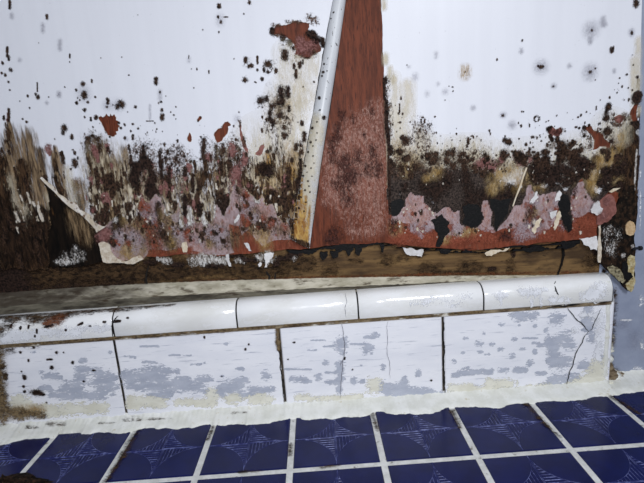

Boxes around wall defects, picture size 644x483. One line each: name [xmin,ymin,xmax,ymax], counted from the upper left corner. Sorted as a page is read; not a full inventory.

damp [0,41,640,293]
peeling [549,210,561,229]
peeling [590,201,603,215]
peeling [581,236,598,250]
peeling [38,355,276,401]
peeling [284,332,381,395]
crack [339,294,347,396]
peeling [379,376,445,397]
peeling [451,310,591,385]
crack [548,248,605,382]
peeling [581,306,598,344]